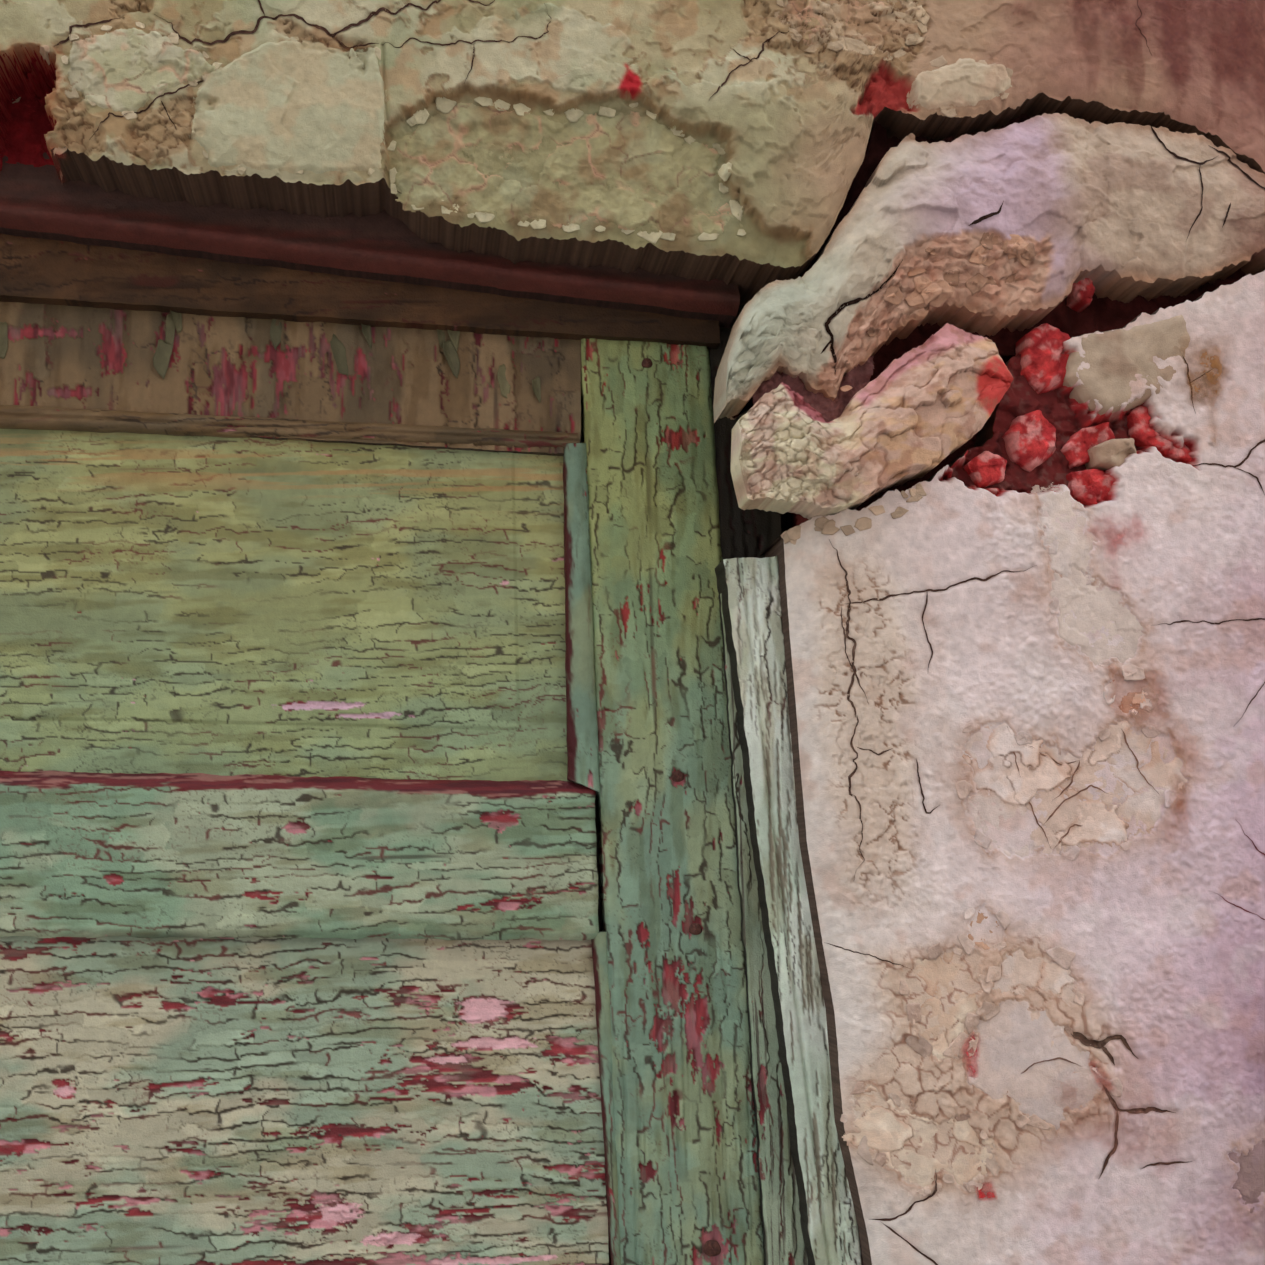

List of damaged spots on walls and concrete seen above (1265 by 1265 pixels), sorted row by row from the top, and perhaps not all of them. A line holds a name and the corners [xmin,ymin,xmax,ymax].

peeling [781,483,926,545]
crack [830,542,1028,880]
peeling [955,482,1188,861]
crack [1151,618,1265,626]
crack [827,943,910,969]
spalling [899,908,1123,1130]
crack [872,1171,938,1265]
peeling [840,1082,1002,1197]
crack [1069,1030,1176,1178]
crack [1141,1161,1193,1169]